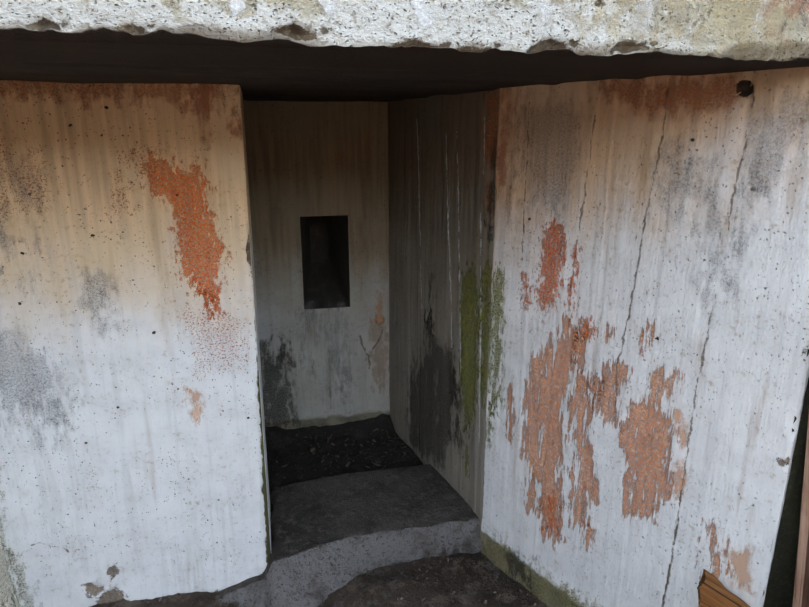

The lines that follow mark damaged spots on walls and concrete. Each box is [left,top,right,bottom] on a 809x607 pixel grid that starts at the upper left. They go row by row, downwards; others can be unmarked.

rust [104,144,255,381]
damp [259,336,299,428]
damp [407,260,495,477]
peeling [504,313,685,550]
crack [614,90,669,420]
spalling [81,563,128,607]